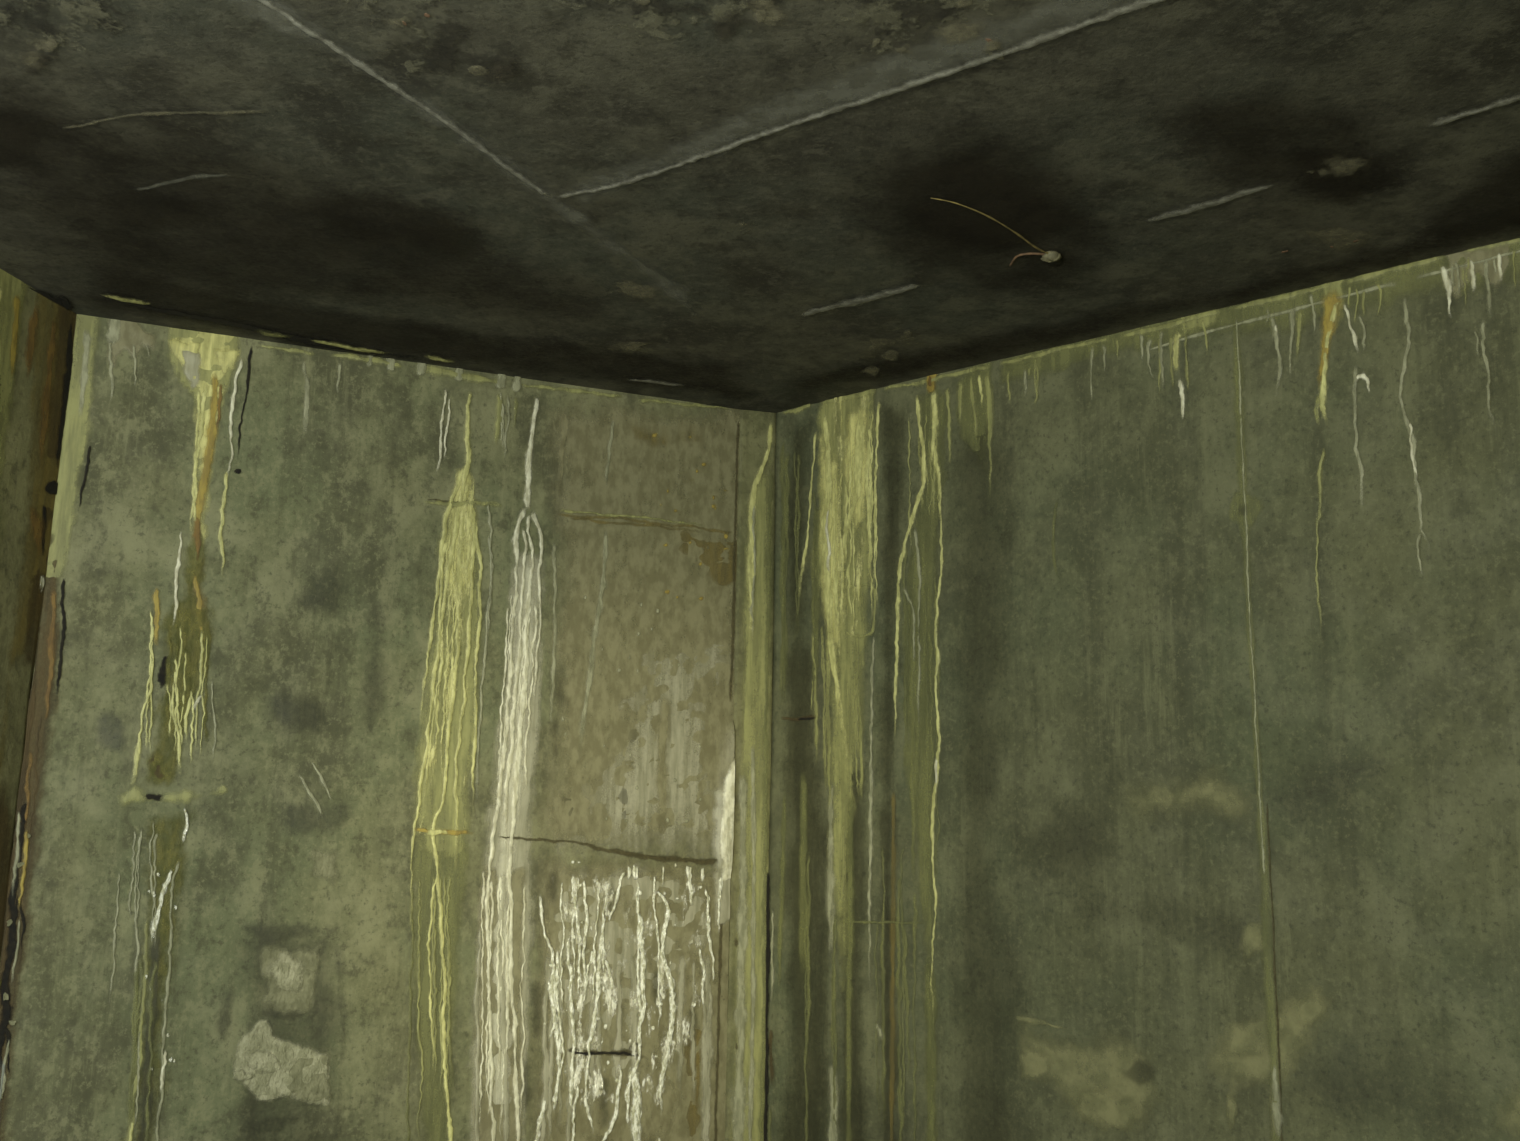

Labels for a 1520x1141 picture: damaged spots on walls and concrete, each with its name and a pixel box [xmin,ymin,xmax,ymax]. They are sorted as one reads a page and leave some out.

rust [0,269,77,1138]
water stain [110,809,189,1141]
spalling [233,947,332,1105]
crack [416,828,716,884]
water stain [334,238,1520,1141]